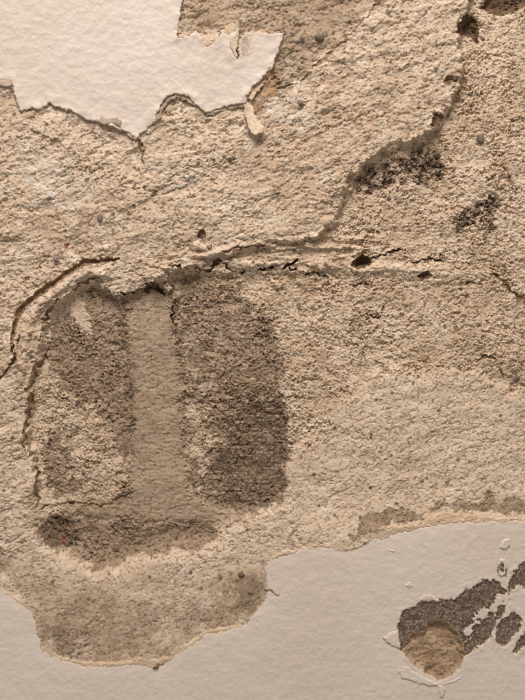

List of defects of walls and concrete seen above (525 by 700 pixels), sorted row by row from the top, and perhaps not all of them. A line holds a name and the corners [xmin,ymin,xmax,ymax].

peeling [243,80,265,136]
spalling [189,240,212,252]
spalling [228,256,256,269]
crack [171,242,329,282]
spalling [305,258,339,273]
crack [369,248,445,264]
crack [117,281,184,324]
crack [362,305,385,319]
crack [465,271,525,306]
water stain [34,272,290,572]
spalling [368,506,525,543]
spalling [383,562,525,687]